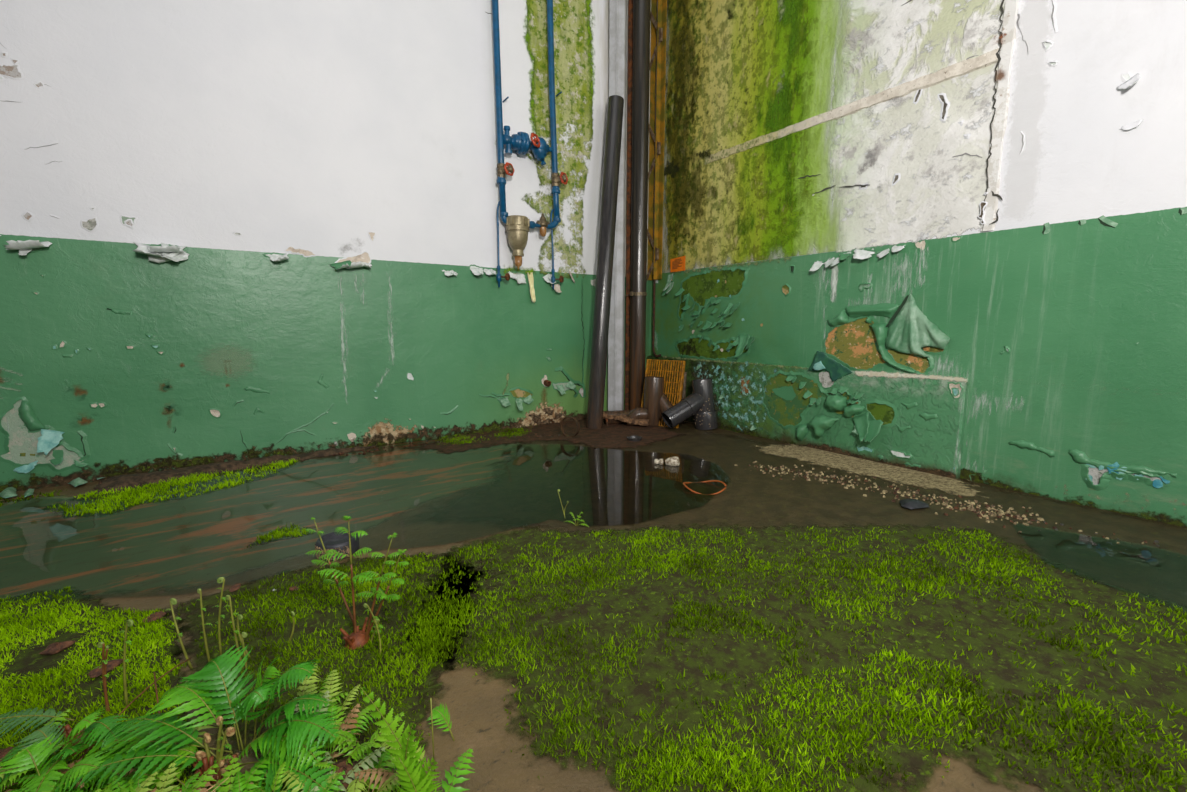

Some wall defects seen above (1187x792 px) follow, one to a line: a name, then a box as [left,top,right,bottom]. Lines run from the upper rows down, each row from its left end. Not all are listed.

crack [953,0,1028,231]
peeling [0,235,52,255]
peeling [119,214,189,263]
flaking render [263,245,317,262]
peeling [330,231,376,269]
crack [1042,215,1118,235]
crack [1178,207,1187,215]
peeling [491,366,586,411]
peeling [655,265,967,468]
peeling [0,396,91,474]
peeling [1008,440,1177,491]
peeling [0,411,523,599]